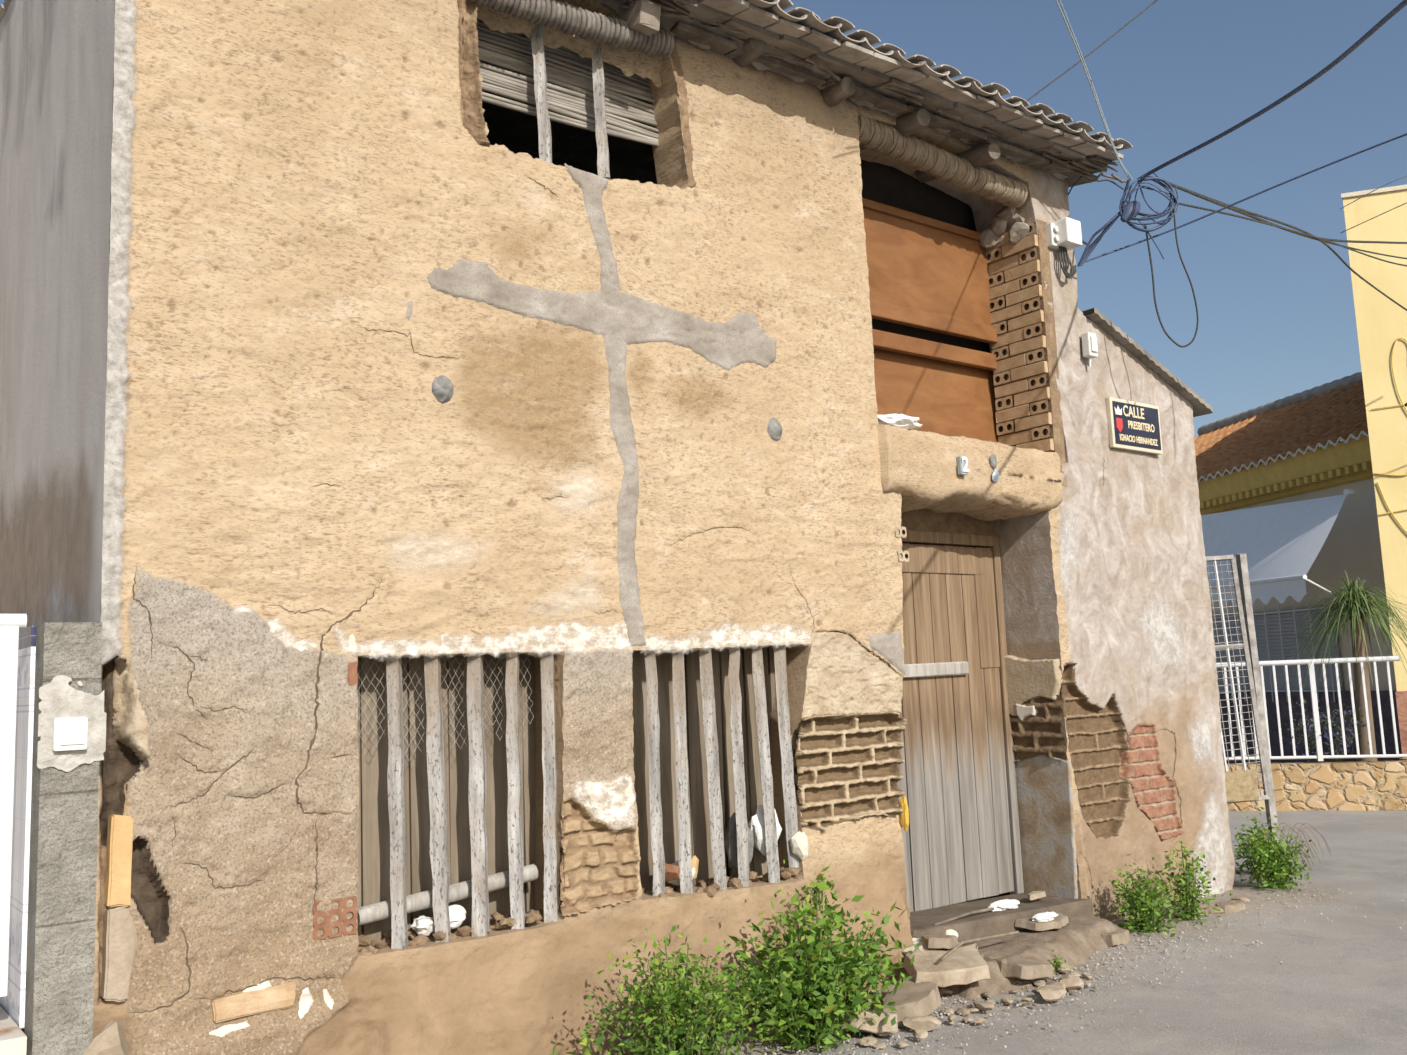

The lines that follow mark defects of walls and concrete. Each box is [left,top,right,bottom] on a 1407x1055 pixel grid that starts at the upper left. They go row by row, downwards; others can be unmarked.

water stain [0,468,89,630]
peeling [267,618,317,652]
spalling [97,655,151,1005]
spalling [131,836,170,943]
crack [128,921,344,1013]
crack [132,567,382,902]
spalling [560,775,641,917]
spalling [335,621,907,831]
peeling [1004,655,1185,899]